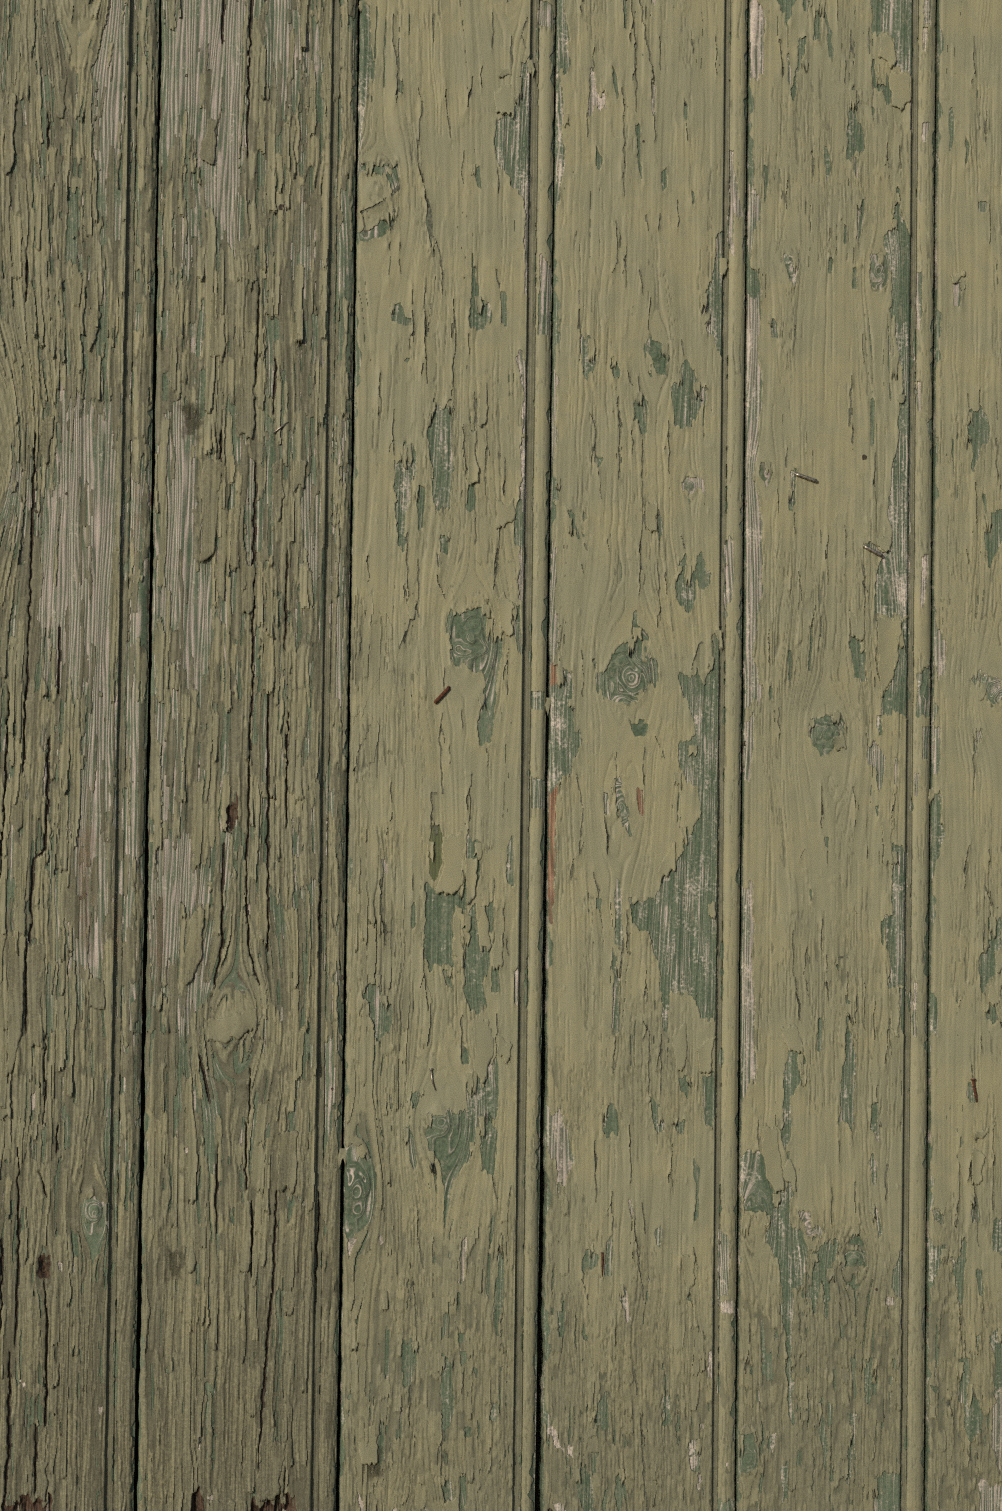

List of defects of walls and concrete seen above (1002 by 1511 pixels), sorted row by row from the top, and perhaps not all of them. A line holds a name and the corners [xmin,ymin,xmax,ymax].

peeling [824,0,930,182]
crack [209,989,263,1051]
peeling [138,0,519,1511]
peeling [481,350,528,654]
peeling [628,610,651,664]
peeling [596,627,723,1130]
peeling [848,186,947,1037]
peeling [543,995,903,1511]
peeling [927,1327,1002,1511]